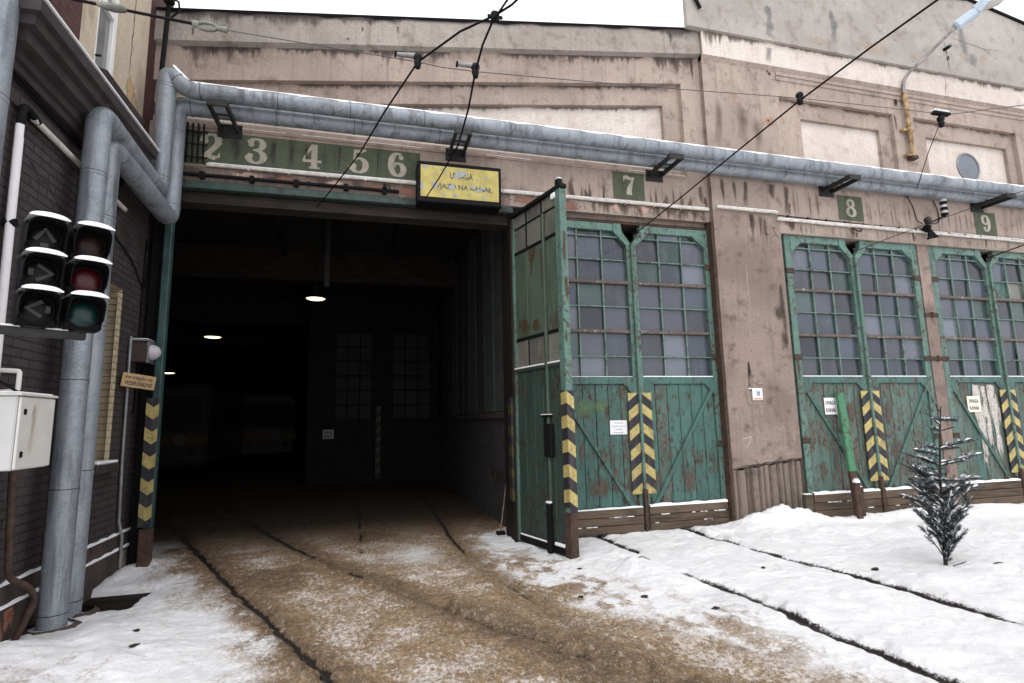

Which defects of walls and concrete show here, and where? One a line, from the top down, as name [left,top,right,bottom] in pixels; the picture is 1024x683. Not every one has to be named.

leakage [705,31,848,58]
peeling [970,384,1004,463]